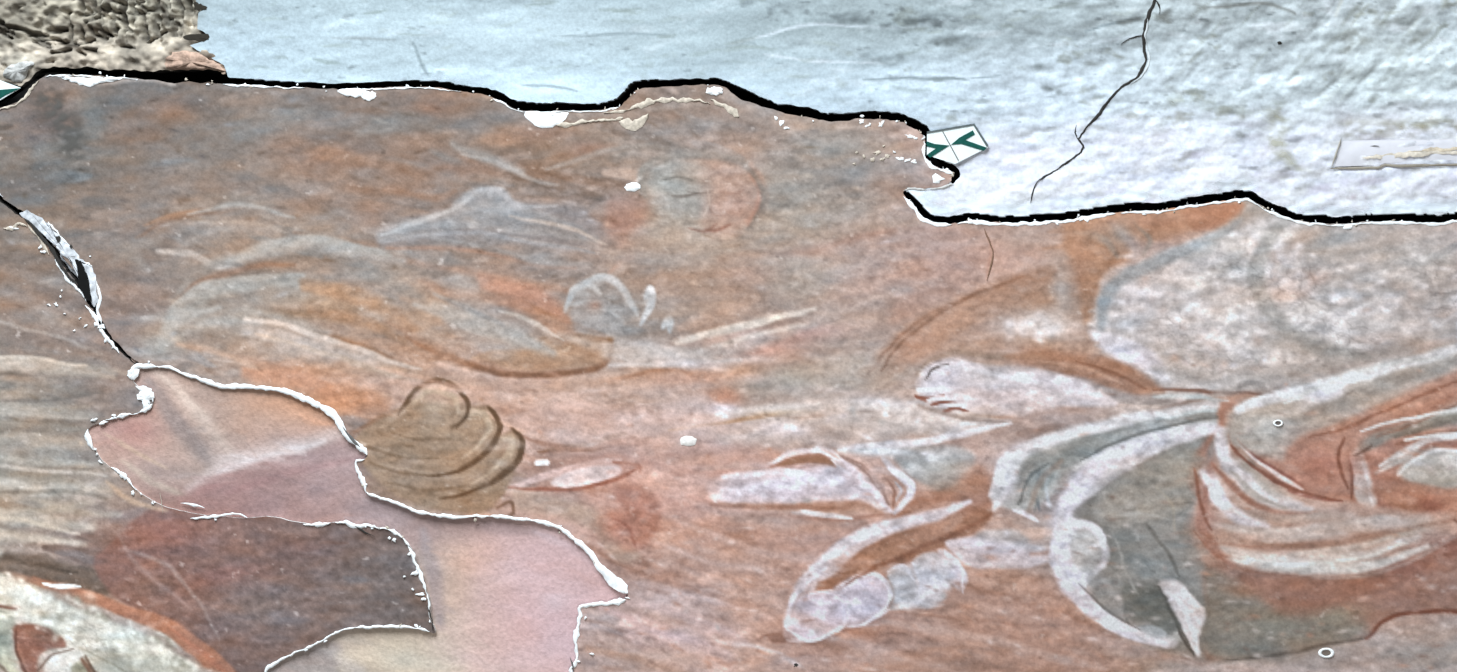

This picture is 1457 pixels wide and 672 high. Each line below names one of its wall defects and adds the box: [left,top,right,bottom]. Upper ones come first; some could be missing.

flaking render [0,0,227,87]
peeling [557,97,739,131]
crack [0,0,1457,279]
peeling [853,145,917,165]
crack [0,194,119,353]